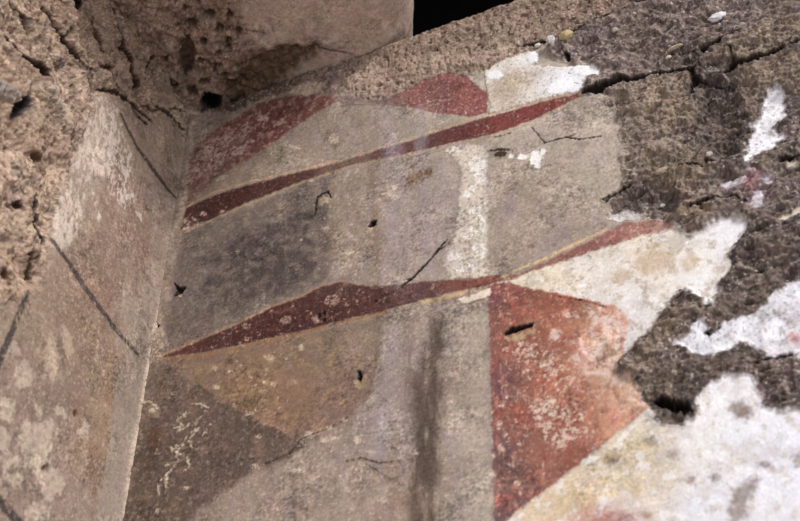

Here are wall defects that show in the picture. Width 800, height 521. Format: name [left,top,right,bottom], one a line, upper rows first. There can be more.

crack [579,25,800,96]
spalling [0,0,800,306]
crack [530,126,602,145]
water stain [354,102,458,294]
peeling [268,292,367,332]
crack [397,238,451,290]
peeling [501,42,800,521]
water stain [367,290,453,521]
peeling [480,419,525,459]